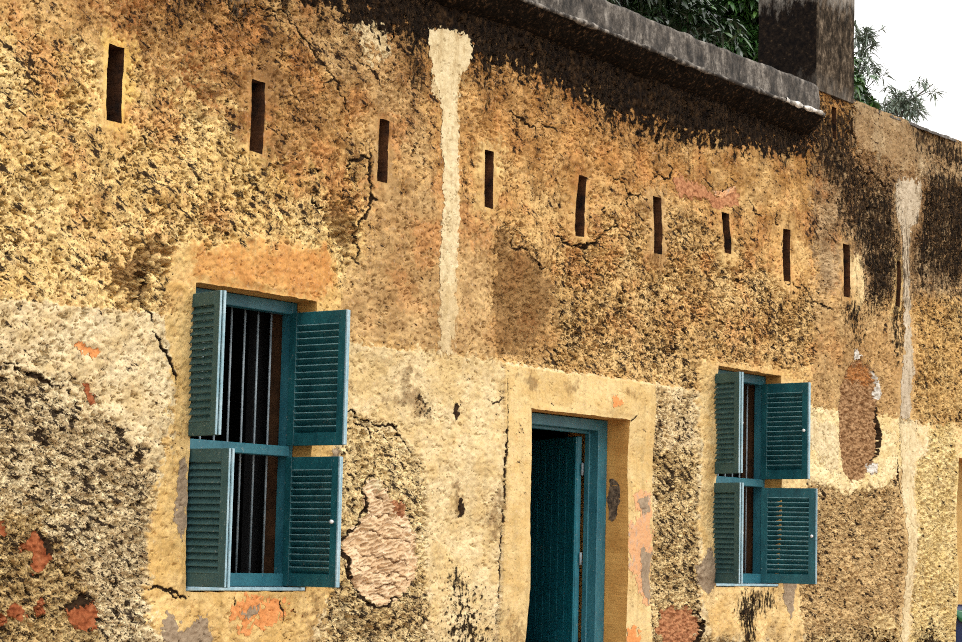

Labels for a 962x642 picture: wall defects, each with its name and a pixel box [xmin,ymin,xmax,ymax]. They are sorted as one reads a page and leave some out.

leakage [157,0,262,51]
crack [225,0,350,132]
crack [357,60,381,87]
crack [346,145,378,257]
crack [134,266,177,384]
leakage [275,0,962,642]
flaking render [838,348,883,483]
flaking render [18,528,54,576]
flaking render [63,595,99,632]
flaking render [340,475,420,609]
peeling [606,479,620,522]
peeling [627,480,706,642]